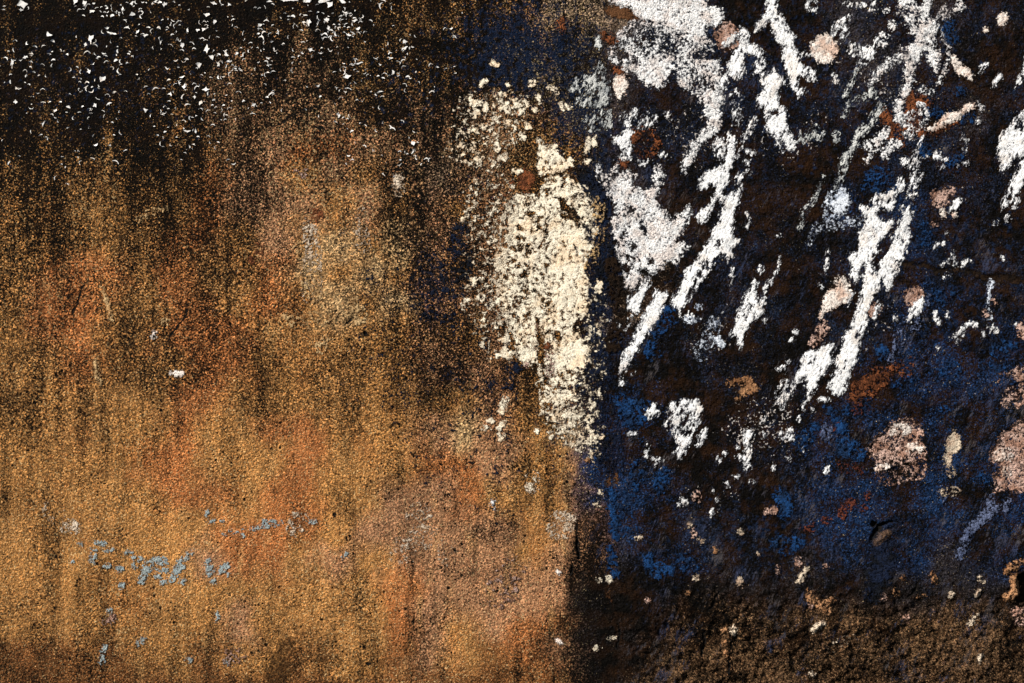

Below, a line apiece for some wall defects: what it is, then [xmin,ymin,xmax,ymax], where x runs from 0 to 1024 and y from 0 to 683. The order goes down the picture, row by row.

damp [392,173,405,197]
rust [495,166,535,197]
damp [300,218,323,303]
rust [521,323,555,378]